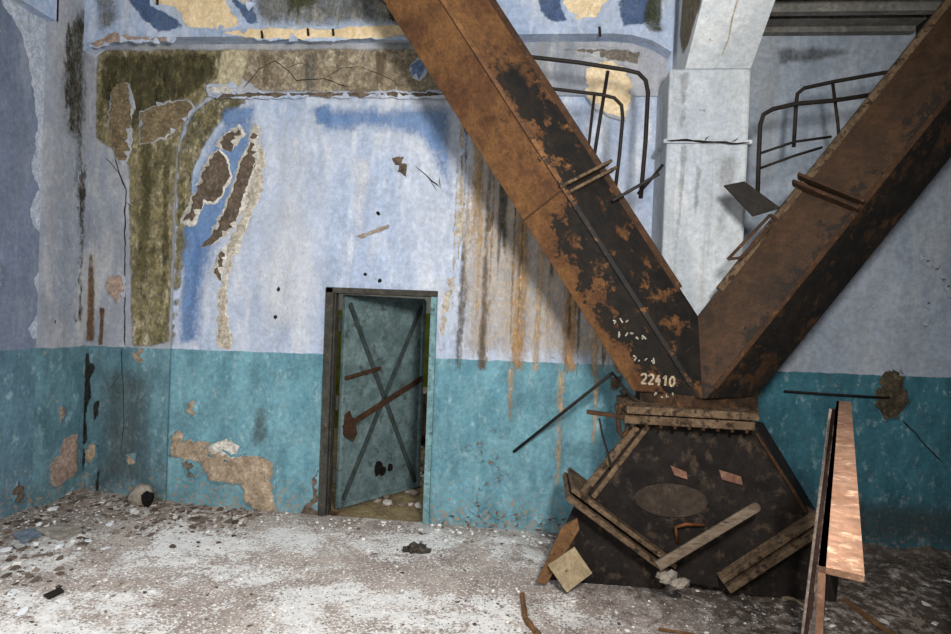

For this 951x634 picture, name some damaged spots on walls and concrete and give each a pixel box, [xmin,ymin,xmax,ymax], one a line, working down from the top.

peeling [87,0,409,48]
peeling [539,0,649,121]
leakage [65,11,441,346]
peeling [180,58,467,350]
rust [453,145,621,440]
peeling [10,479,28,505]
peeling [48,432,98,489]
peeling [168,427,277,512]